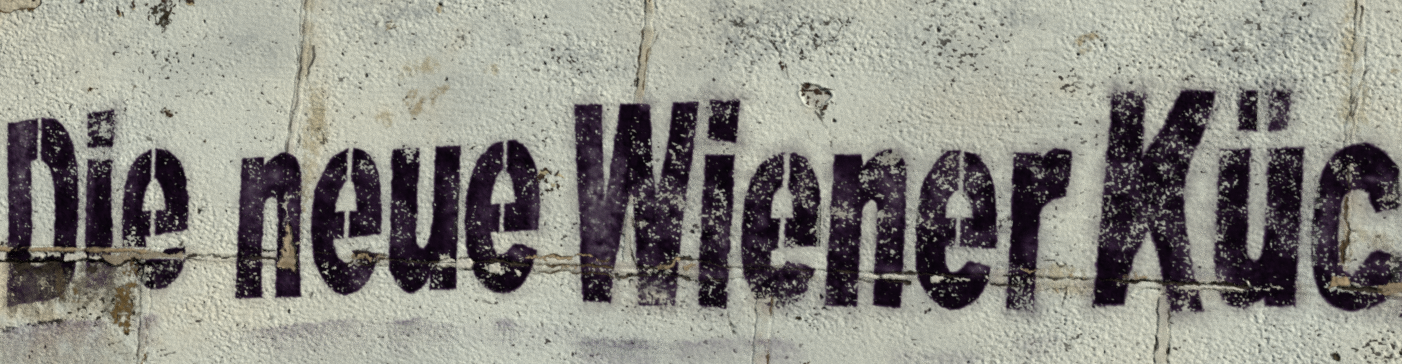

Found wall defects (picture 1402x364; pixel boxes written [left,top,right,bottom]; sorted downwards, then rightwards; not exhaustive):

flaking render [0,0,41,13]
crack [286,0,325,152]
leakage [13,258,116,327]
crack [186,250,277,261]
crack [346,217,952,315]
crack [987,260,1250,364]